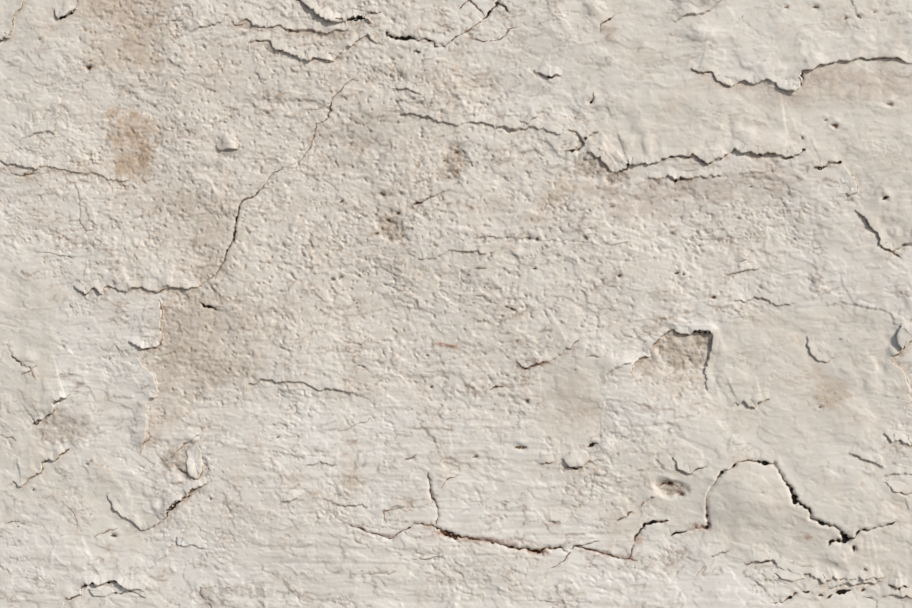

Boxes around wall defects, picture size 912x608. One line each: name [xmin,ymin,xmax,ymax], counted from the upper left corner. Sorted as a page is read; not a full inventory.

peeling [52,0,78,19]
peeling [187,0,384,62]
crack [386,0,515,53]
peeling [691,49,912,92]
crack [187,76,358,310]
peeling [396,104,806,183]
peeling [813,155,858,196]
peeling [854,204,912,258]
peeling [73,278,201,453]
peeling [599,322,720,391]
peeling [107,434,207,531]
crack [350,459,896,570]